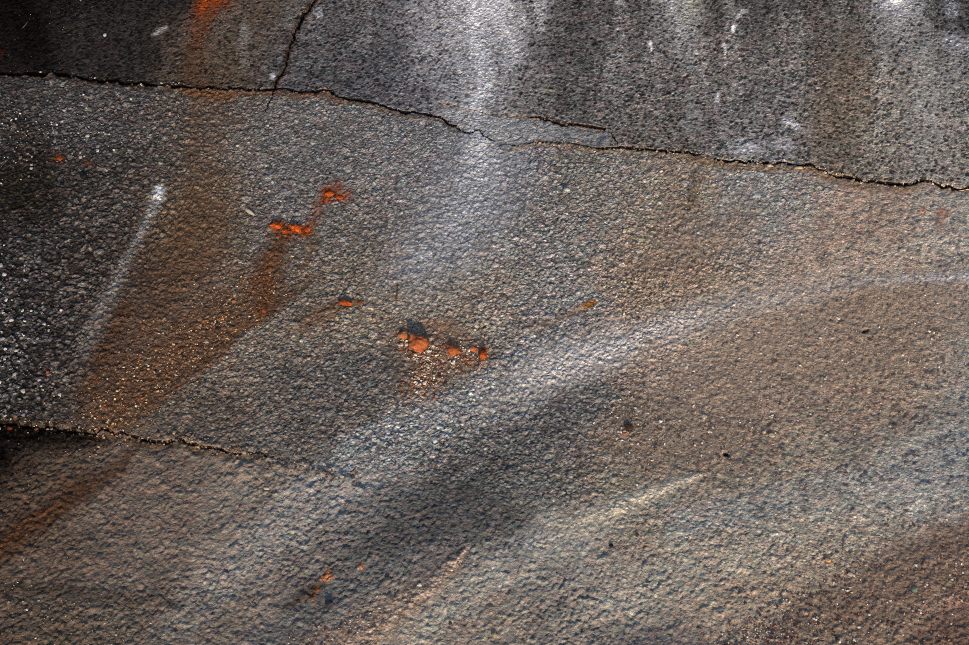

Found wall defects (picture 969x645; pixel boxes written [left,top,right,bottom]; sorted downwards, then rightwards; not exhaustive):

crack [0,0,969,191]
crack [0,420,280,460]